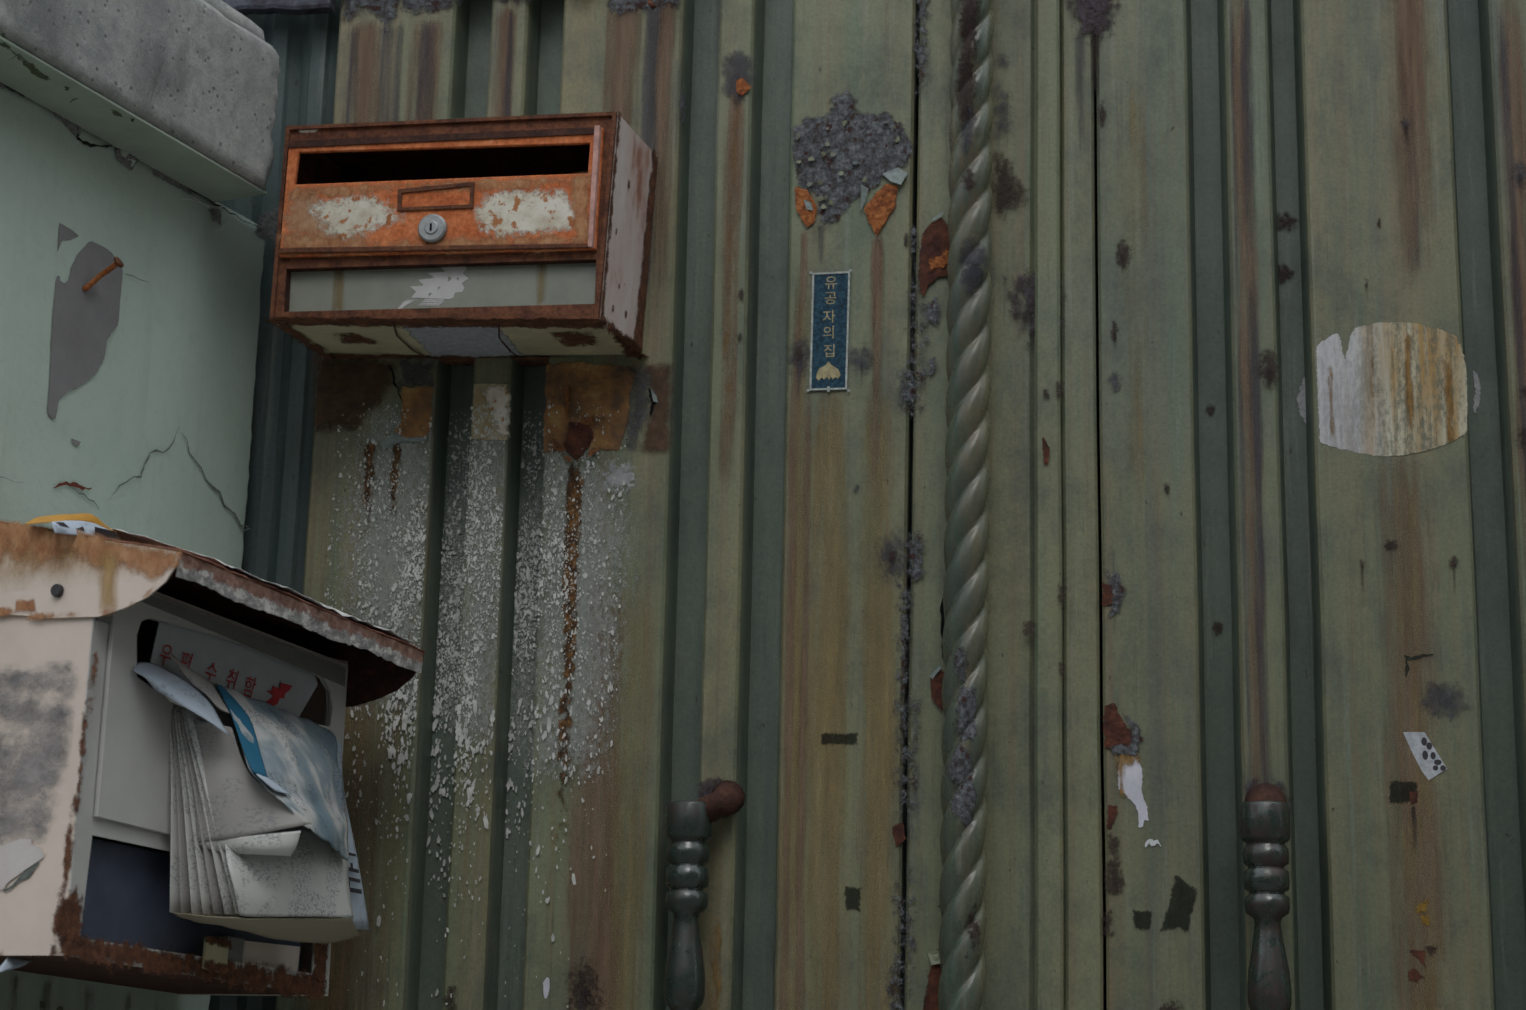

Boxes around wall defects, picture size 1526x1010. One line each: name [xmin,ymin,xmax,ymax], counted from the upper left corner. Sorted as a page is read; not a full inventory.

corrosion [789,90,913,451]
corrosion [904,211,986,325]
crack [3,426,250,531]
corrosion [266,0,681,1010]
corrosion [930,599,977,827]
peeling [1102,703,1161,936]
corrosion [911,949,942,1010]